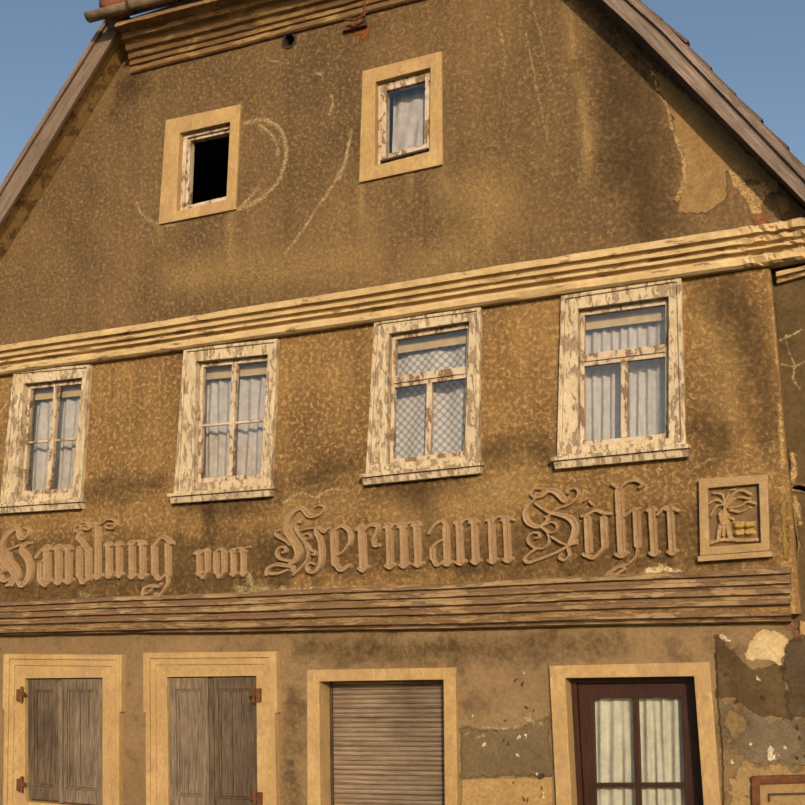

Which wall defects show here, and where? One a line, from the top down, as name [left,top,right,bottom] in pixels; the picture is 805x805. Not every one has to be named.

flaking render [643,57,791,226]
crack [774,302,805,389]
flaking render [714,264,805,744]
crack [786,435,805,561]
flaking render [728,746,805,805]